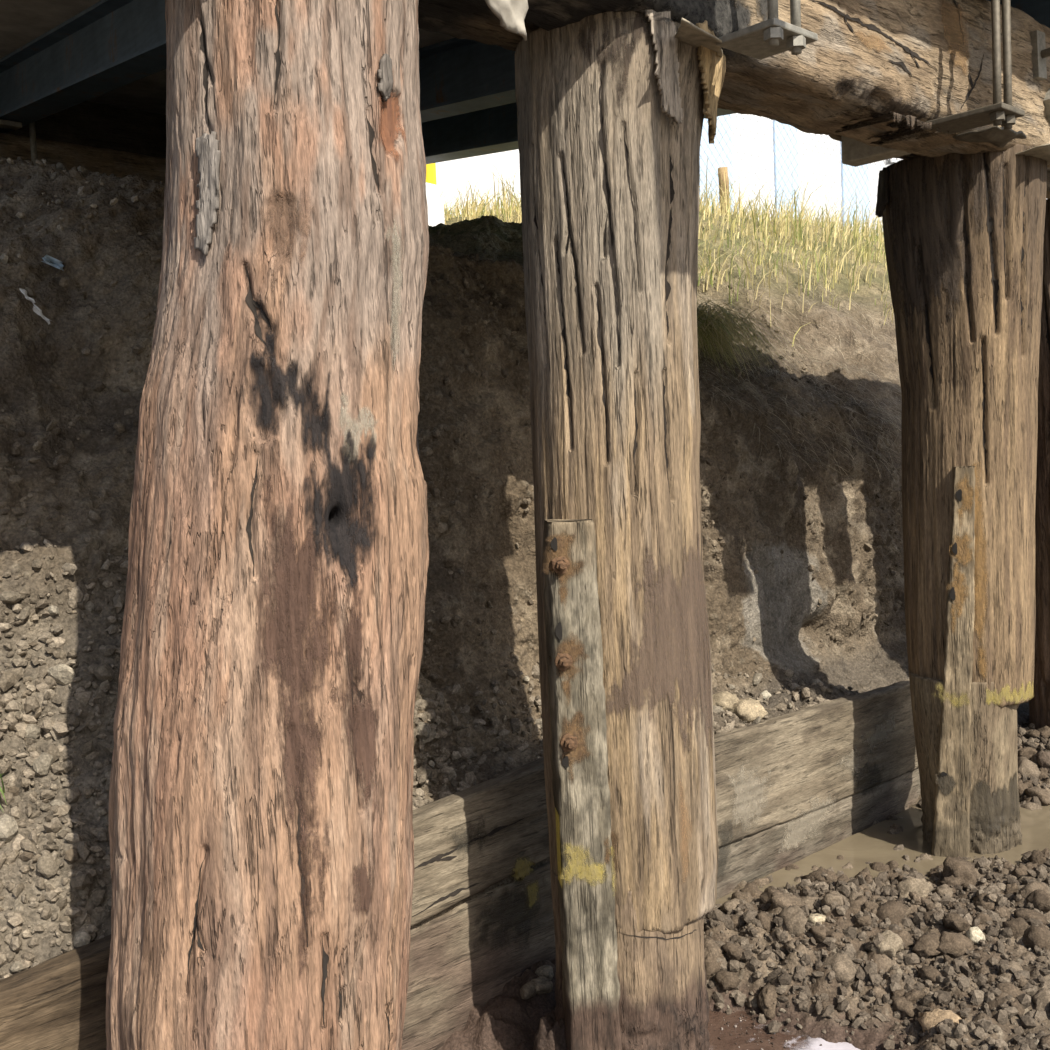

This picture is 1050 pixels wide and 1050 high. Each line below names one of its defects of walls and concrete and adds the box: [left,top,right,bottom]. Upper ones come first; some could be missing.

crack [812,0,938,77]
crack [953,0,984,109]